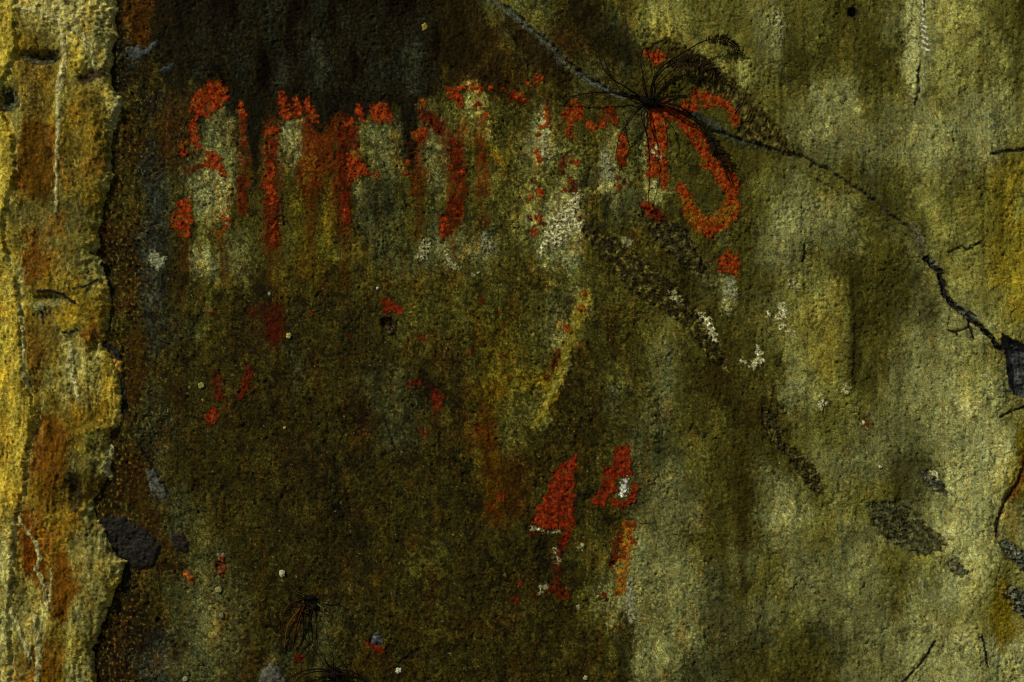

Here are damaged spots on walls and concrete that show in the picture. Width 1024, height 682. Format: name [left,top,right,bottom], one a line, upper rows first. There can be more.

damp [149,0,570,170]
crack [492,0,637,99]
crack [913,65,921,105]
crack [992,147,1024,155]
crack [687,110,1003,350]